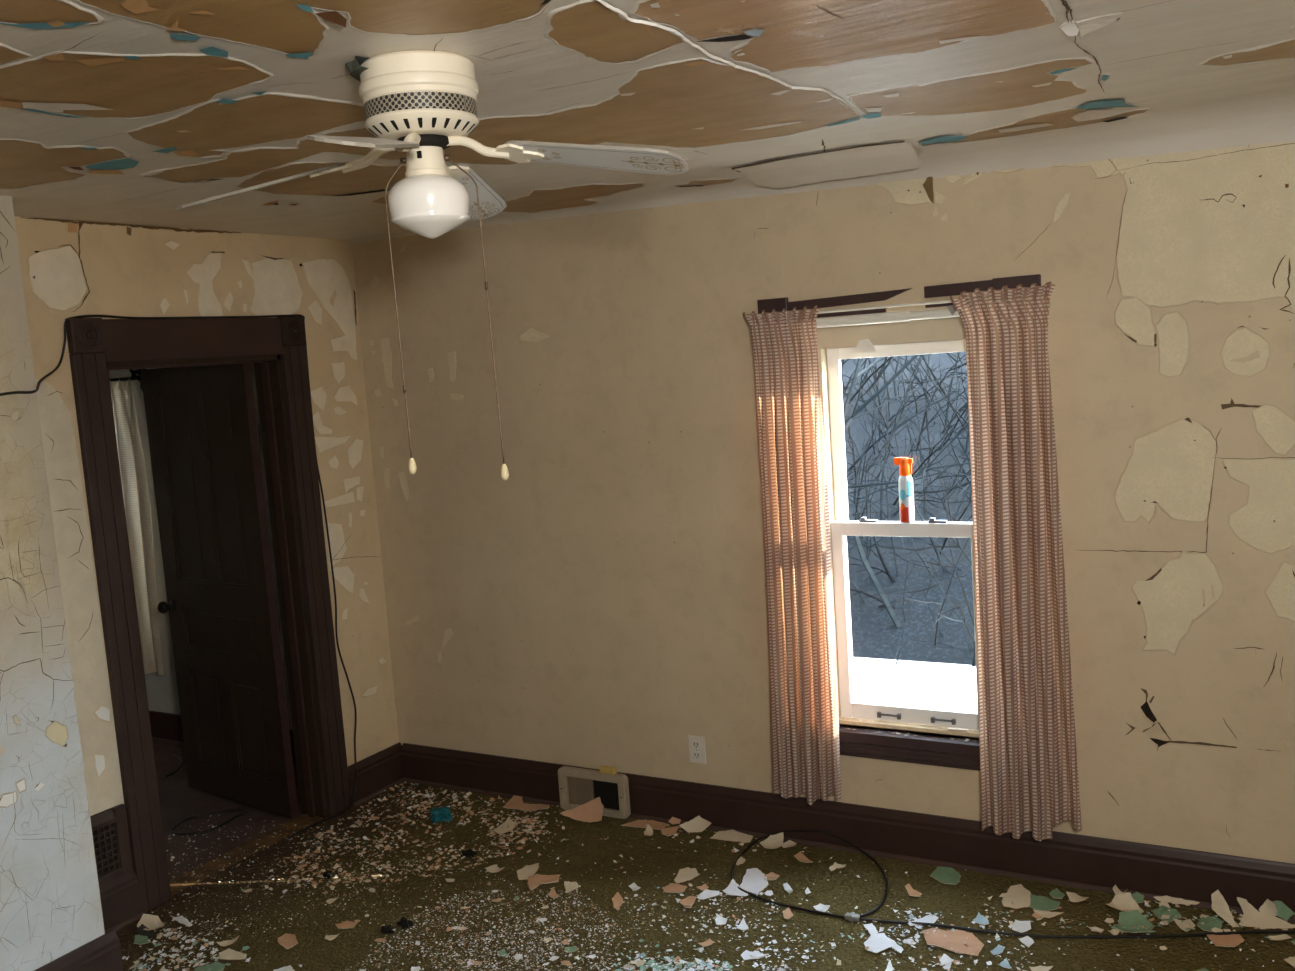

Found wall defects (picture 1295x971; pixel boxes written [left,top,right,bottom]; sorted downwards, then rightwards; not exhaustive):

crack [0,211,14,274]
peeling [28,245,87,311]
peeling [501,182,646,213]
peeling [0,0,1151,206]
crack [1061,0,1240,92]
peeling [1053,141,1295,377]
peeling [1198,38,1295,66]
leakage [0,301,61,617]
peeling [159,251,370,620]
peeling [1114,398,1295,622]
crack [0,435,93,955]
peeling [0,379,124,971]